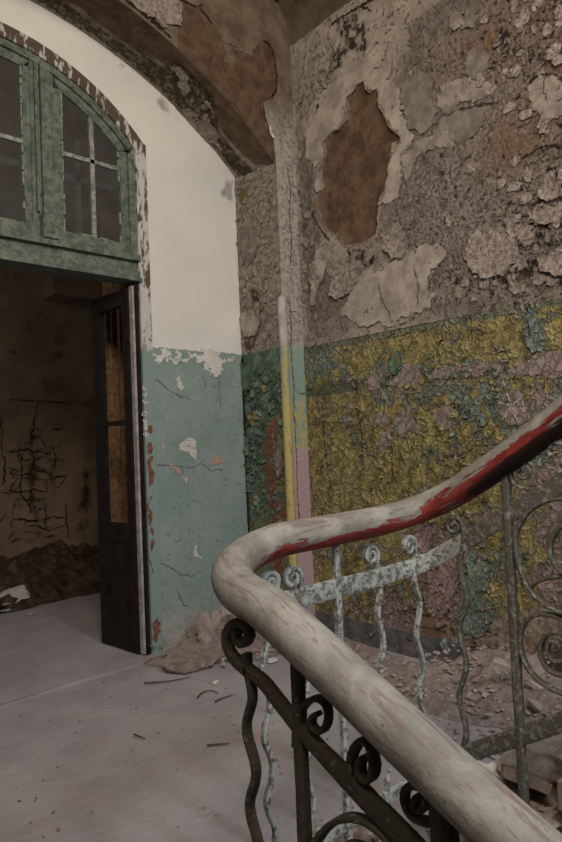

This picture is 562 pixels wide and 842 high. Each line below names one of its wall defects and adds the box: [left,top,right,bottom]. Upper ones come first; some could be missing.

spalling [49,0,287,531]
spalling [297,0,562,516]
crack [0,399,69,542]
spalling [146,426,166,572]
crack [242,388,250,532]
peeling [396,493,501,555]
peeling [513,504,562,653]